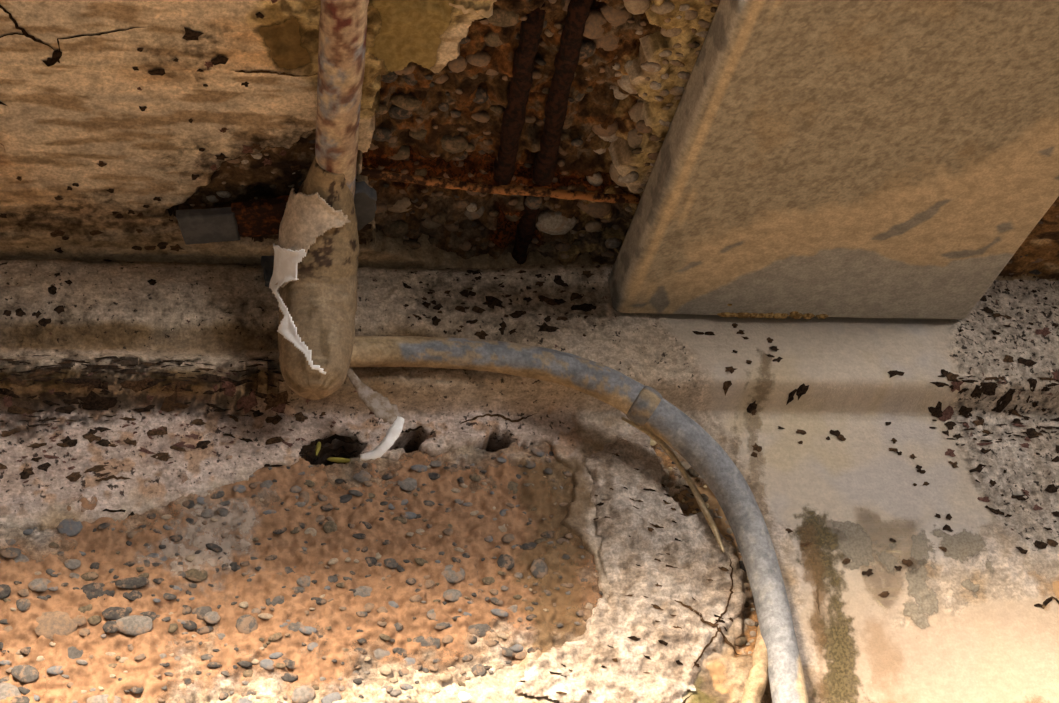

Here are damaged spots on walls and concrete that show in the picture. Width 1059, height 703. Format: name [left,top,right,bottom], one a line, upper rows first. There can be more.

crack [0,5,149,67]
peeling [256,15,312,70]
spalling [355,0,720,265]
spalling [178,129,316,210]
corrosion [362,146,634,195]
damp [723,350,752,395]
damp [786,383,809,405]
damp [826,430,846,441]
damp [889,438,930,486]
spalling [0,442,603,703]
crack [674,558,743,667]
damp [786,507,860,703]